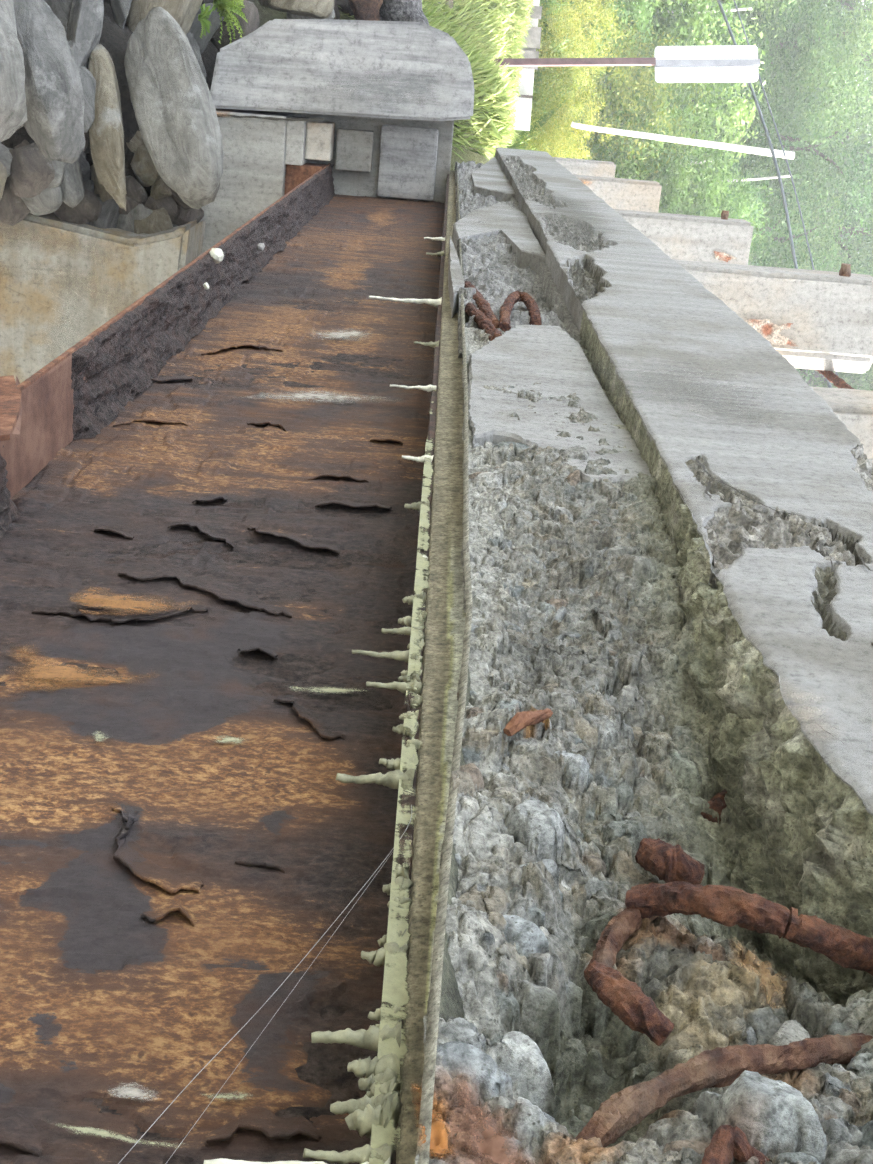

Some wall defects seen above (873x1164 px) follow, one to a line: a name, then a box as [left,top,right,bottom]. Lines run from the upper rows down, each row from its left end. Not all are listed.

crack [695,456,806,517]
rust [248,522,340,555]
rust [32,568,294,623]
rust [12,647,157,691]
spalling [415,157,873,1164]
efflorescence [374,439,434,1099]
rust [110,803,203,927]
rust [734,943,785,1005]
rust [0,1113,42,1157]
rust [205,1106,323,1143]
efflorescence [369,1119,401,1164]
rust [414,1086,452,1160]